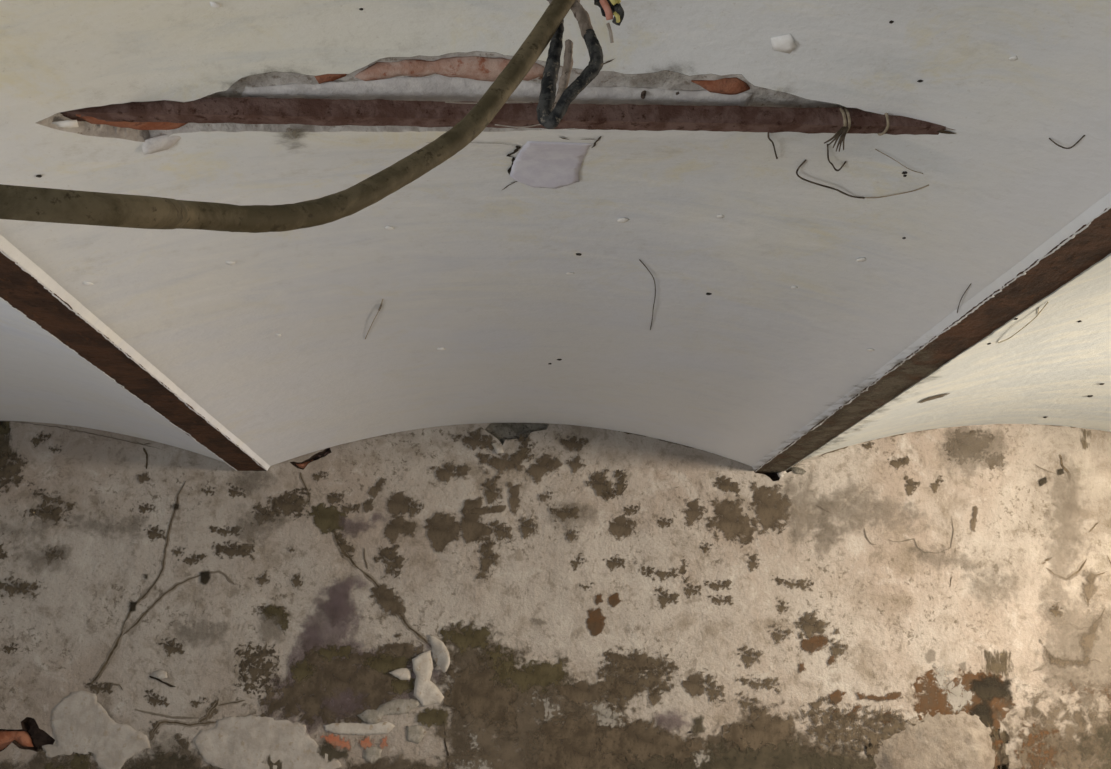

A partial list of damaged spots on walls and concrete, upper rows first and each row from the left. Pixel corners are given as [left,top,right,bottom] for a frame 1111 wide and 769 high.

flaking render [36,102,452,154]
flaking render [145,51,513,102]
flaking render [507,60,546,103]
flaking render [556,65,883,115]
damp [0,421,76,527]
damp [887,456,944,496]
crack [89,481,245,740]
damp [139,427,878,769]
peeling [0,690,151,769]
damp [121,721,222,769]
peeling [193,635,450,769]
damp [911,617,1111,769]